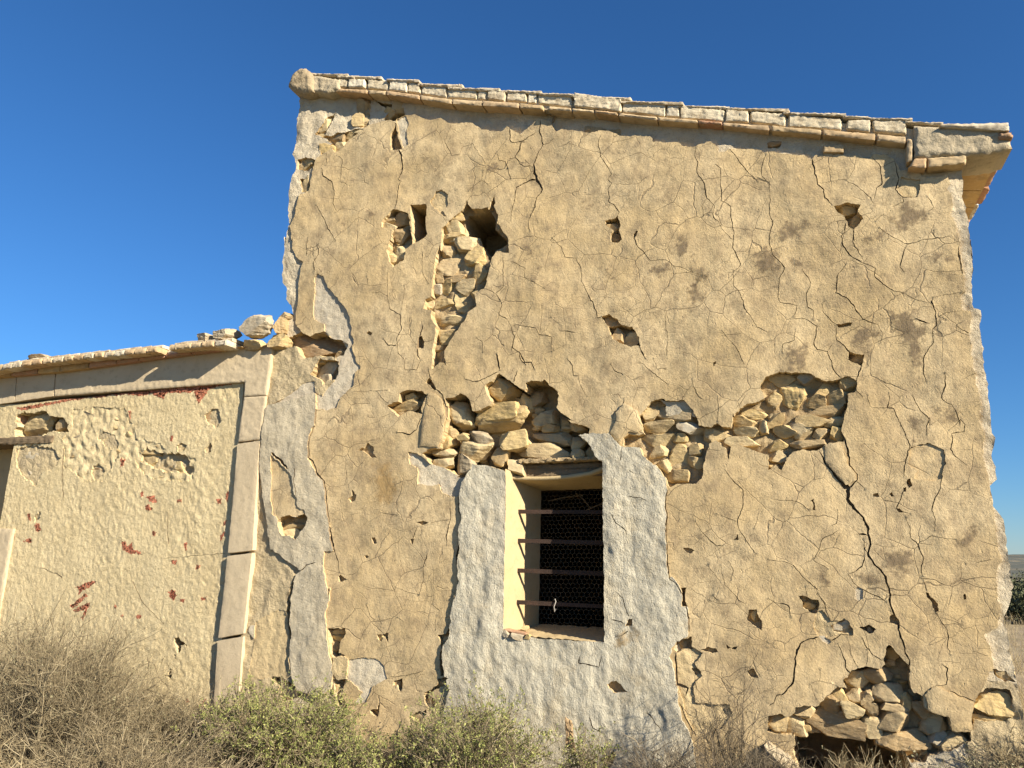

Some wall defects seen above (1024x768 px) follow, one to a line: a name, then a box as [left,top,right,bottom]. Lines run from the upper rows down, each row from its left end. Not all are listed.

crack [445,114,601,318]
spalling [14,406,212,487]
flaking render [273,274,360,410]
spalling [381,190,597,497]
crack [464,262,586,395]
spalling [602,314,640,347]
spalling [623,371,857,487]
crack [695,149,969,590]
crack [271,408,340,669]
crack [611,431,910,707]
crack [674,654,707,737]
spalling [767,645,1016,768]